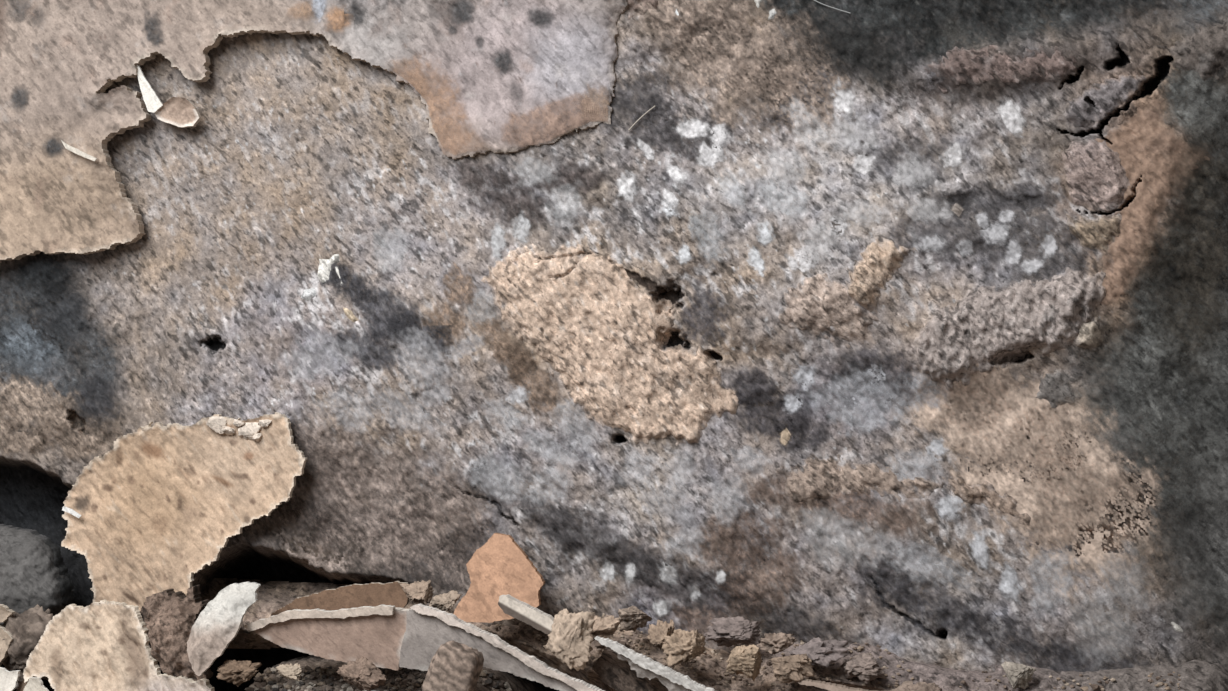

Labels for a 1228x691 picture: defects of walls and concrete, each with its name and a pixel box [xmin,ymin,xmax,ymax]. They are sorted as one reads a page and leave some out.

flaking render [0,0,628,263]
water stain [605,0,1156,286]
crack [1080,200,1132,215]
crack [1060,47,1174,140]
water stain [0,254,123,459]
spalling [478,244,740,446]
water stain [831,72,1228,639]
flaking render [0,604,15,666]
flaking render [61,412,307,611]
crack [457,487,518,526]
water stain [254,414,916,642]
crack [871,577,947,637]